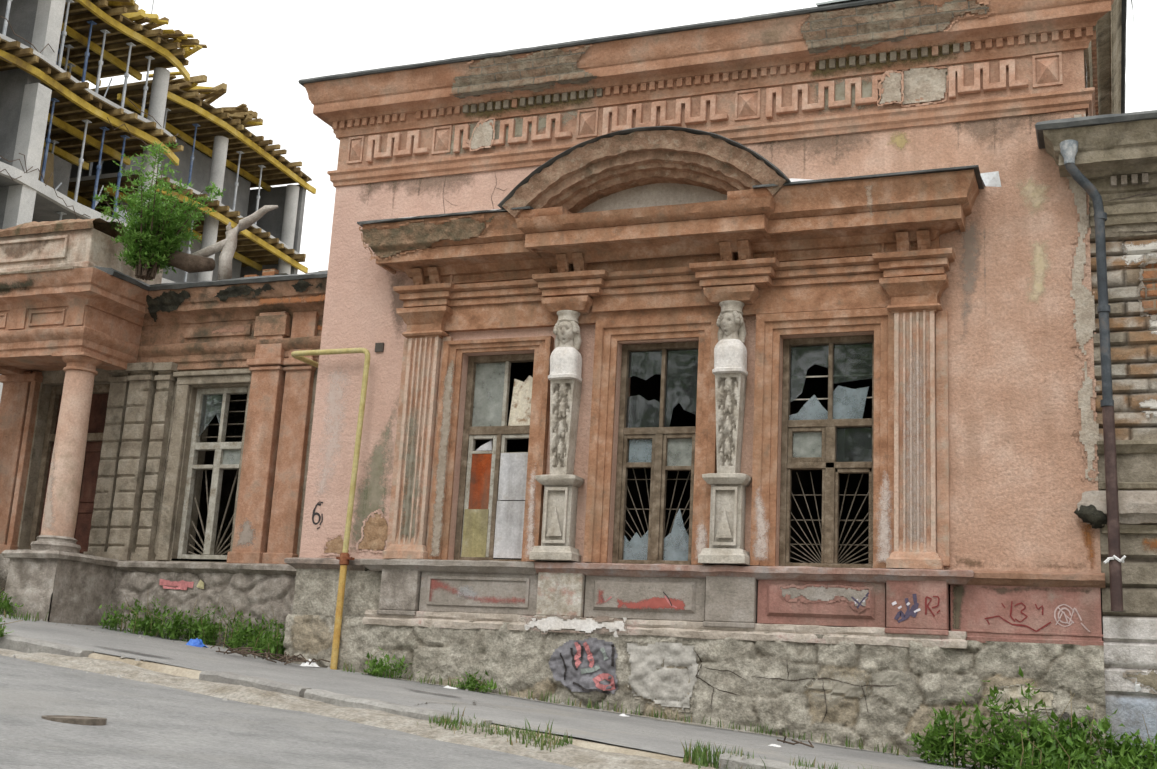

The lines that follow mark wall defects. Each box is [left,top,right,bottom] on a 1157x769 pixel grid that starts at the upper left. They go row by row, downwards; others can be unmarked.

flaking render [259,294,325,306]
peeling [1064,177,1099,482]
flaking render [1137,260,1157,320]
damp [353,423,391,541]
damp [400,419,418,537]
spalling [321,509,389,558]
crack [694,650,904,722]